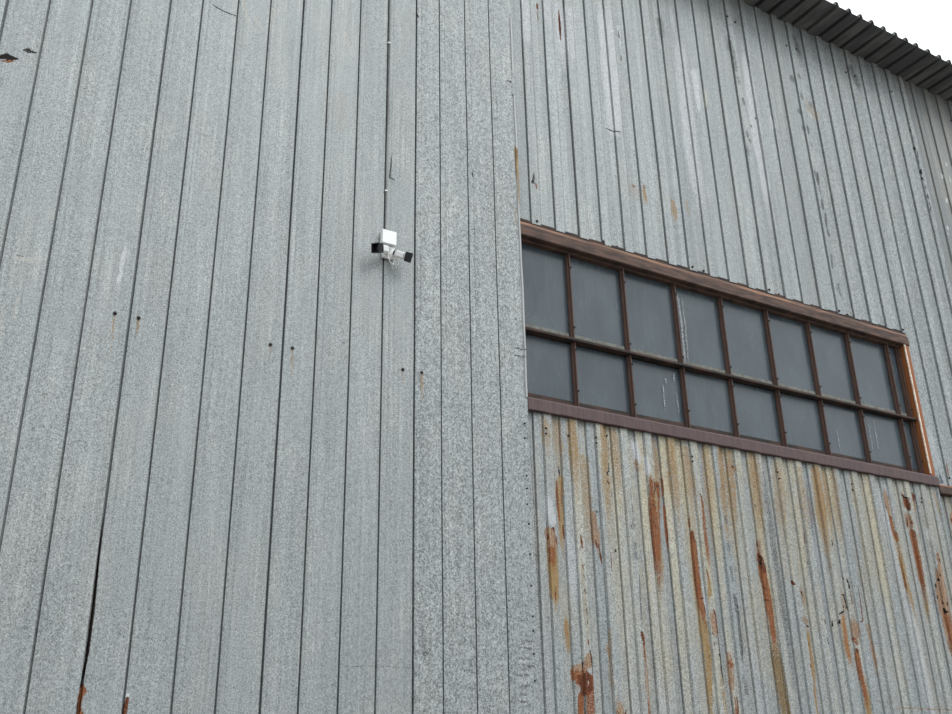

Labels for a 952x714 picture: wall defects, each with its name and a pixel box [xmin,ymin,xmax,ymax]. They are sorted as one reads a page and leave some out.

rust [76,684,87,714]
rust [540,417,844,714]
rust [840,615,878,714]
rust [882,490,950,711]